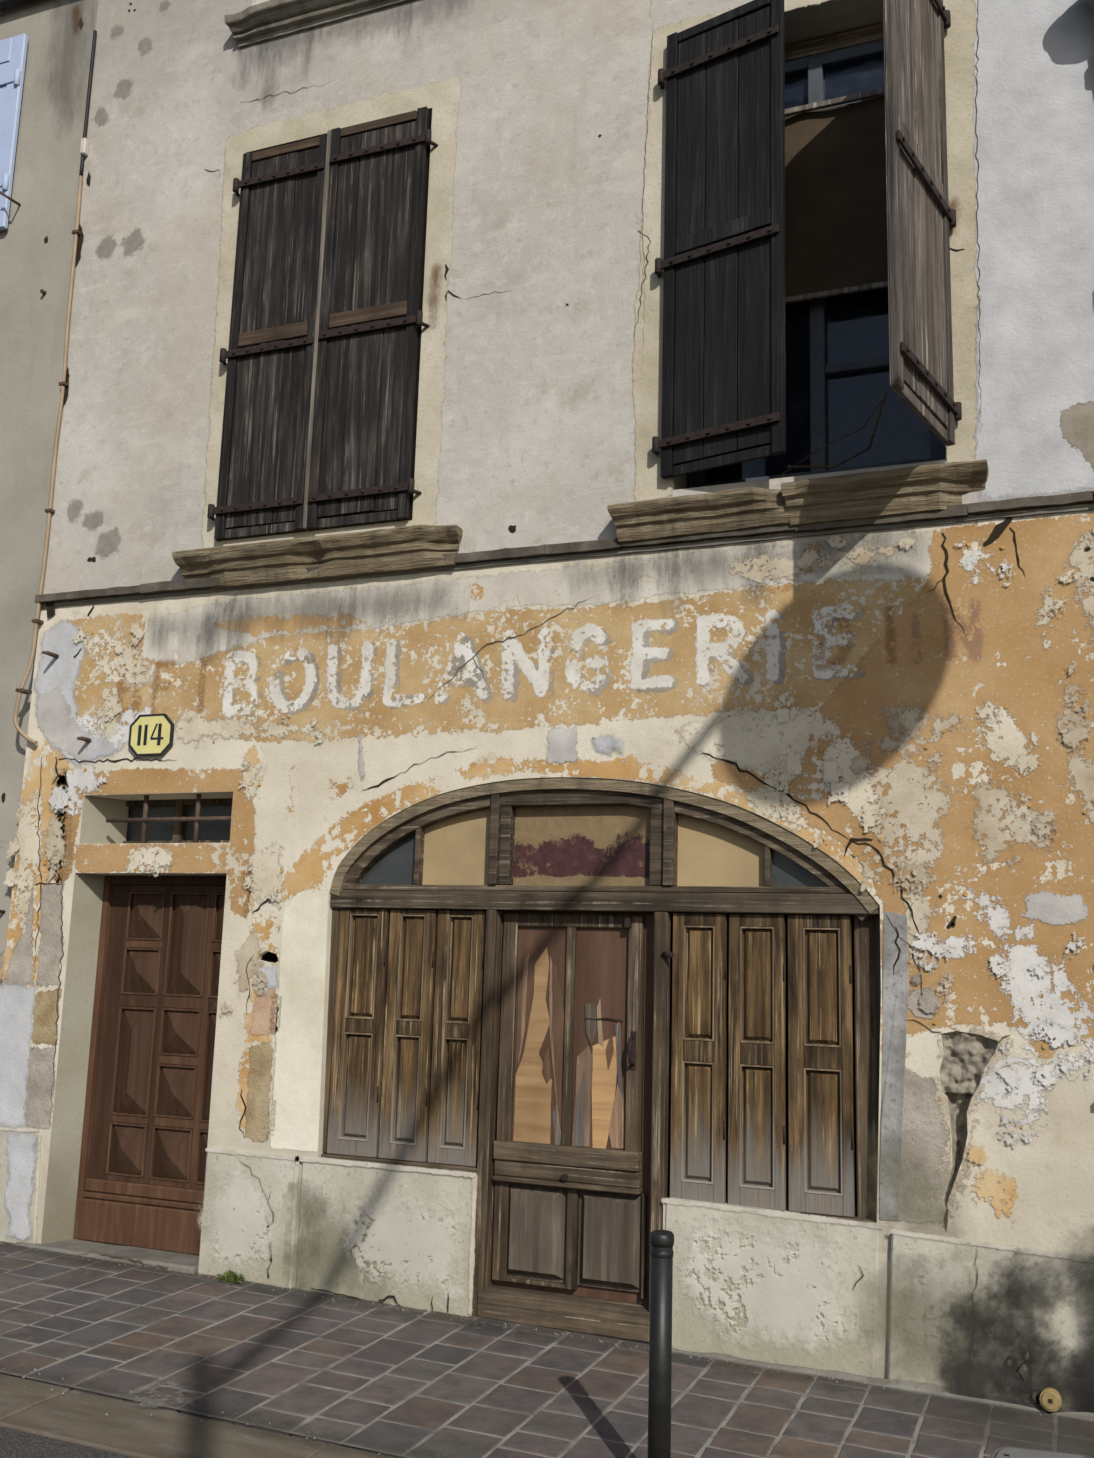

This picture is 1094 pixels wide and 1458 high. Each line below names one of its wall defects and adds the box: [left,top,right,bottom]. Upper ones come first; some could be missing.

leakage [96,229,144,257]
spalling [1059,401,1094,471]
leakage [67,500,120,557]
crack [428,594,601,699]
crack [928,532,966,636]
peeling [3,759,107,1129]
crack [33,756,169,1123]
peeling [125,844,173,878]
flaking render [218,841,284,1143]
crack [702,752,923,1014]
flaking render [675,660,1094,1231]
leakage [905,1253,1094,1414]